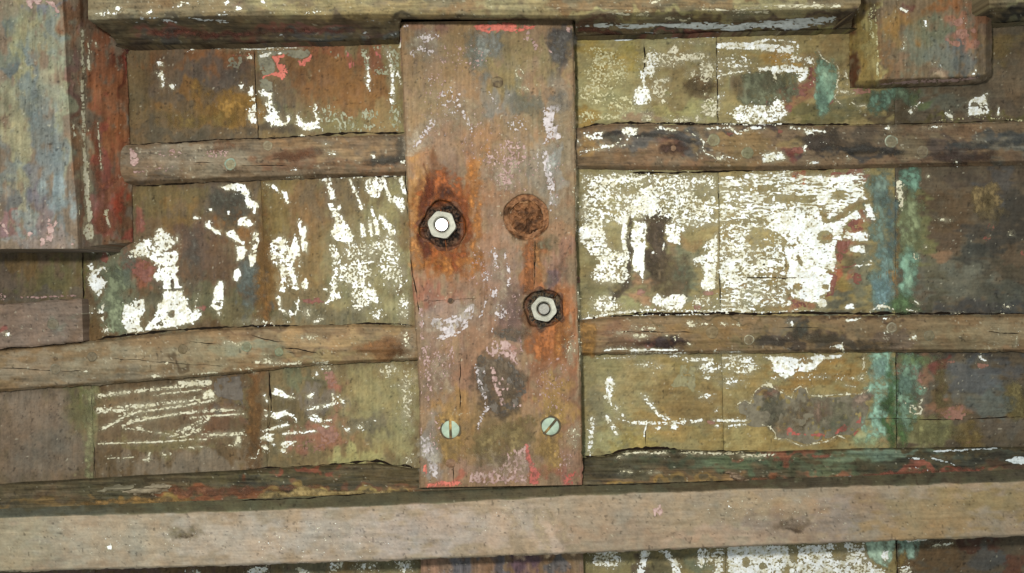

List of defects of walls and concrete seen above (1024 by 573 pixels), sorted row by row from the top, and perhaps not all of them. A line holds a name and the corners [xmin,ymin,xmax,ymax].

corrosion [408,163,482,274]
peeling [96,0,876,488]
crack [530,243,538,288]
corrosion [521,241,596,359]
peeling [895,180,904,210]